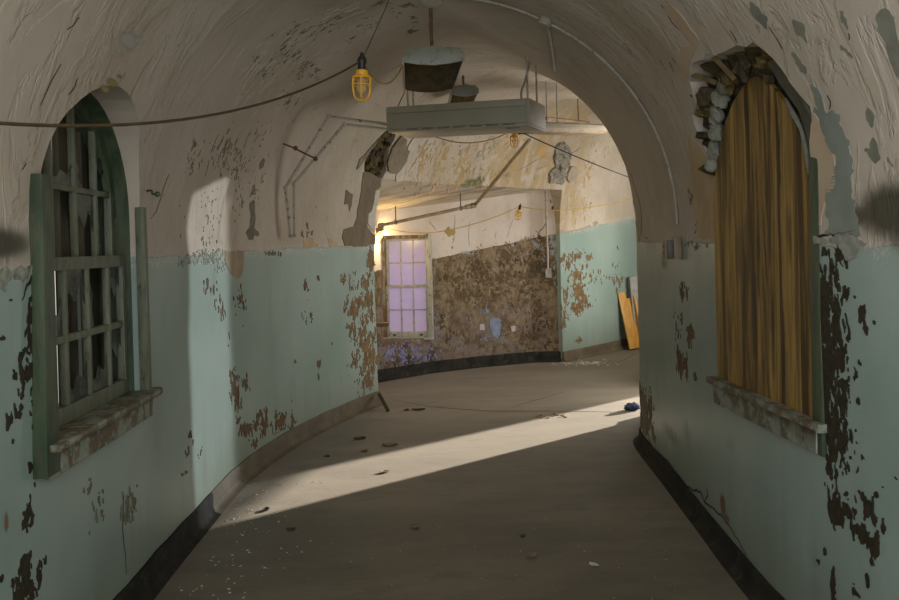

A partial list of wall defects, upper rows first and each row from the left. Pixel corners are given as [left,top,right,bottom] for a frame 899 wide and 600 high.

peeling [185,121,267,240]
peeling [178,188,247,321]
flaking render [301,131,623,398]
peeling [5,295,33,444]
peeling [229,366,297,449]
peeling [639,379,656,443]
peeling [673,281,697,383]
peeling [690,47,886,598]
peeling [21,461,36,533]
peeling [83,477,105,535]
peeling [120,484,138,525]
peeling [0,550,47,600]